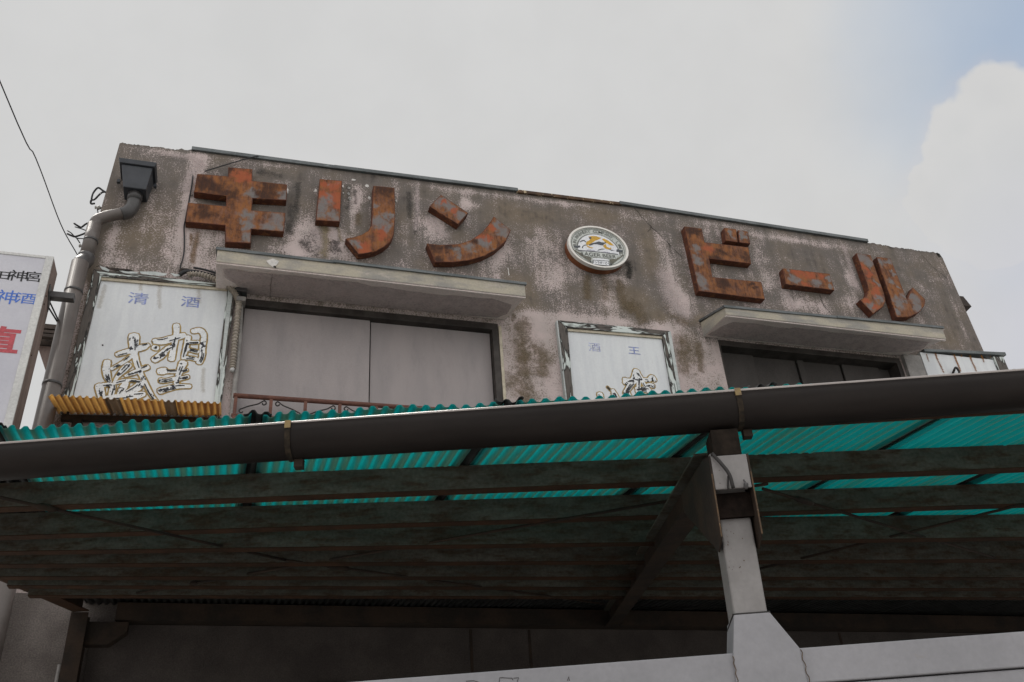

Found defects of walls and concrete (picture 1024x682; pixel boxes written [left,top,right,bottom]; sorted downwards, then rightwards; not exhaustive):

leakage [224,269,550,402]